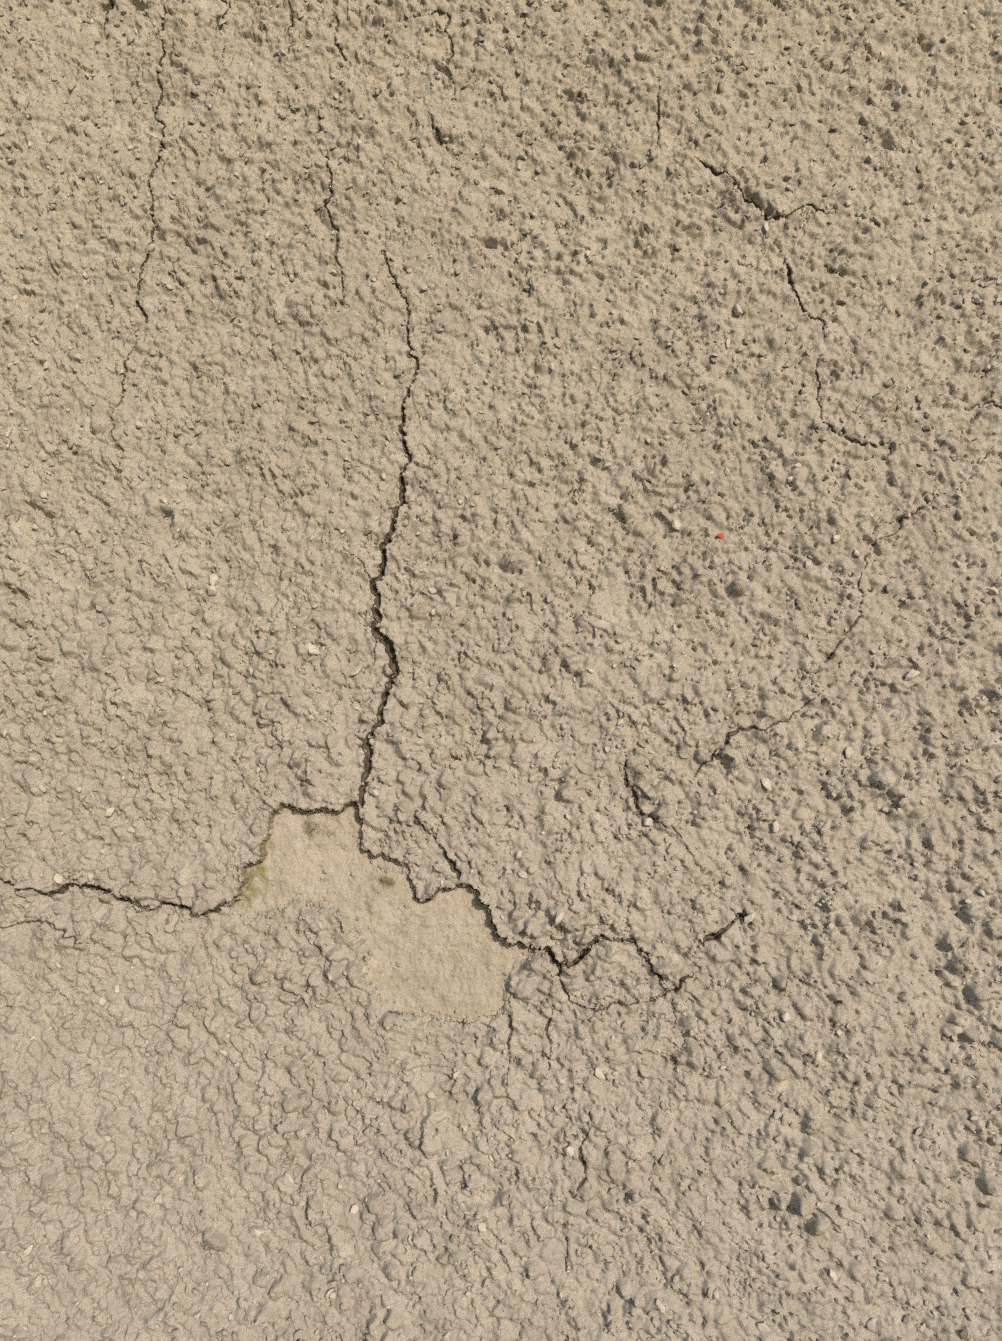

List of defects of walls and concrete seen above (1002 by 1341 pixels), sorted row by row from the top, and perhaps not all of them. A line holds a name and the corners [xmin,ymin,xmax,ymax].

spalling [330,6,640,165]
crack [110,2,168,497]
spalling [476,142,681,284]
crack [694,156,836,234]
crack [784,260,878,447]
crack [344,249,421,807]
spalling [651,501,685,530]
crack [0,875,241,945]
spalling [176,767,664,1099]
crack [415,817,460,879]
spalling [744,908,756,924]
spalling [751,1011,868,1112]